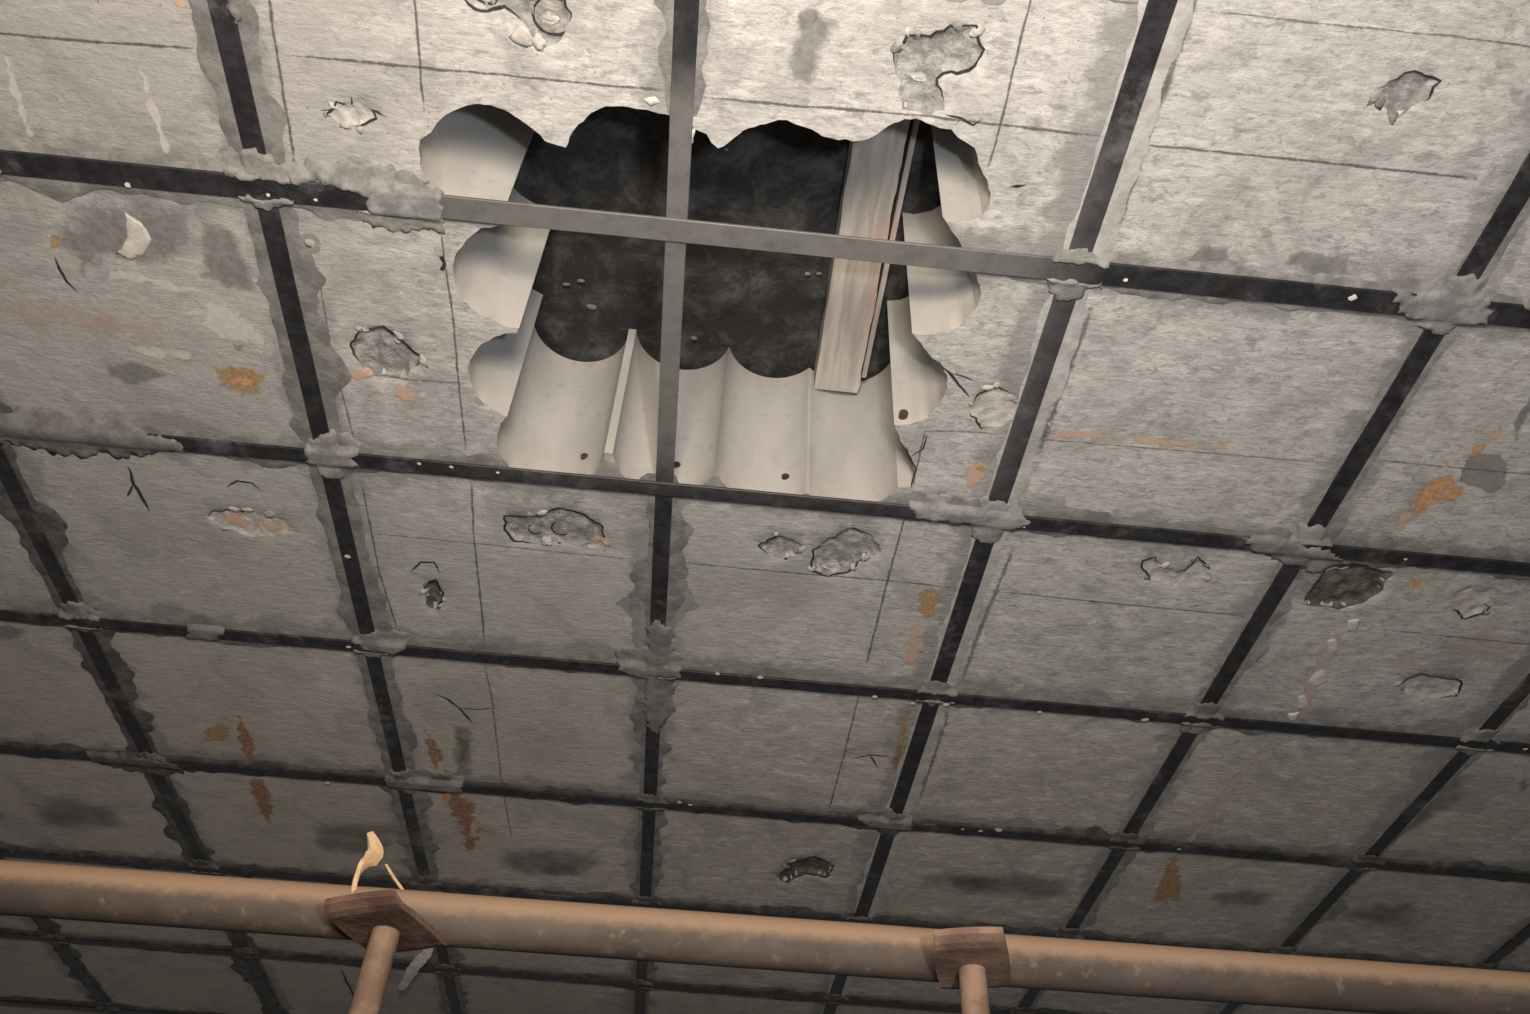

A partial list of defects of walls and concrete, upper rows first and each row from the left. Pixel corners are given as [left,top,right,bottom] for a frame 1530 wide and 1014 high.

spalling [465,0,572,51]
spalling [890,20,986,114]
spalling [1367,70,1442,125]
corrosion [215,344,264,394]
corrosion [1396,473,1463,531]
spalling [503,507,610,551]
spalling [758,528,882,577]
spalling [1303,563,1393,609]
corrosion [904,589,938,664]
corrosion [204,716,256,761]
corrosion [251,779,272,823]
corrosion [442,792,479,850]